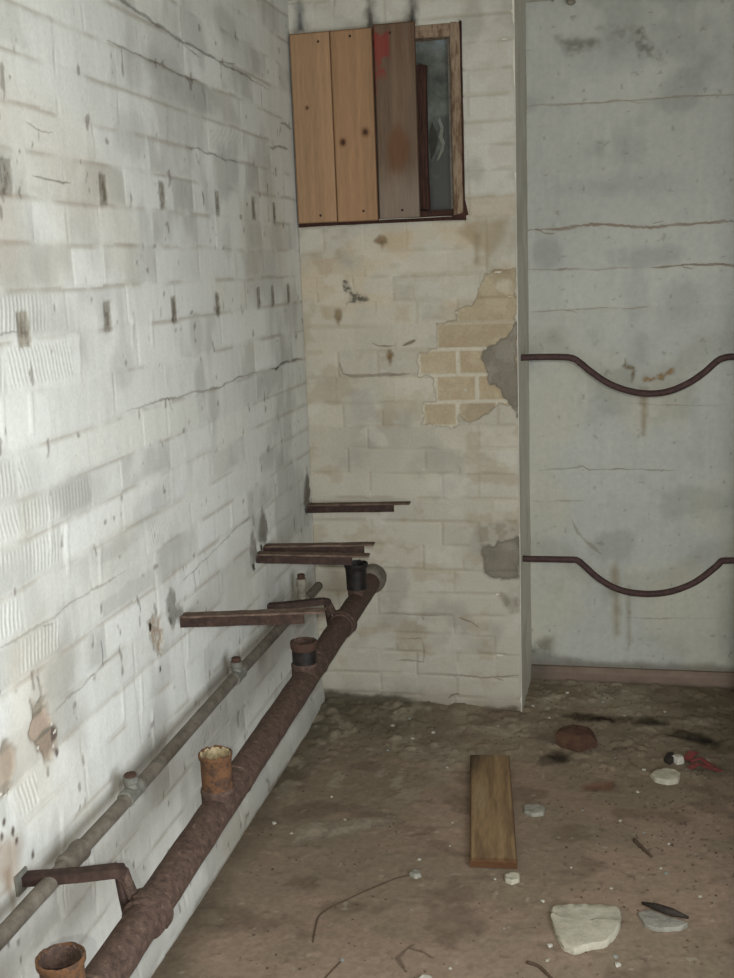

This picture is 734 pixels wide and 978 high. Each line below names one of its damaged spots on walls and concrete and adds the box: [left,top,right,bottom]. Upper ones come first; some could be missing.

peeling [417,268,518,428]
spalling [28,698,58,759]
spalling [0,743,13,798]